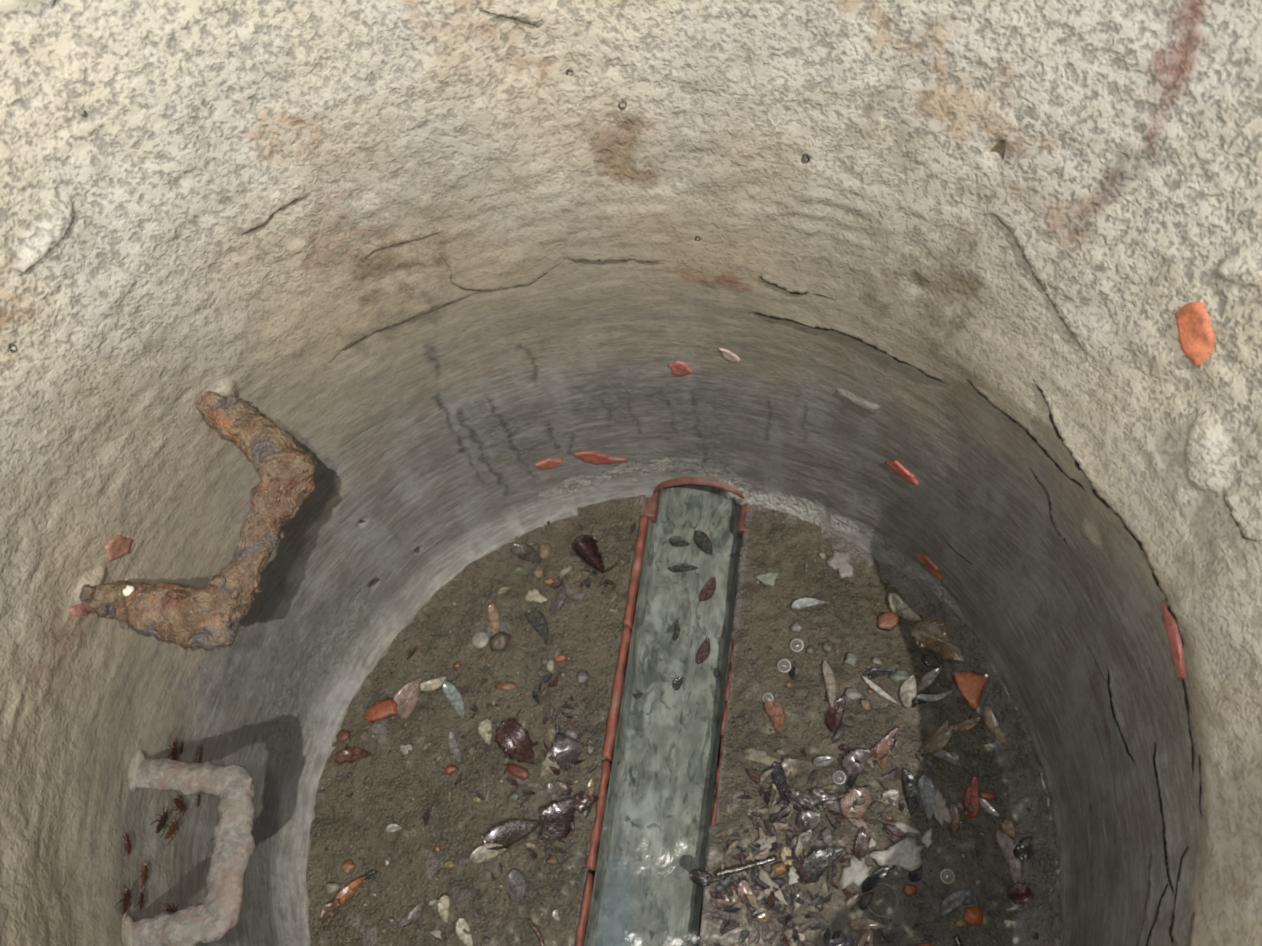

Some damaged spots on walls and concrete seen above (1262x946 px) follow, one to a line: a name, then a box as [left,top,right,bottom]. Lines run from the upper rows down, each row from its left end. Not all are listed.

crack [329,213,1183,648]
corrosion [79,582,154,618]
crack [1088,646,1194,946]
crack [1182,679,1202,819]